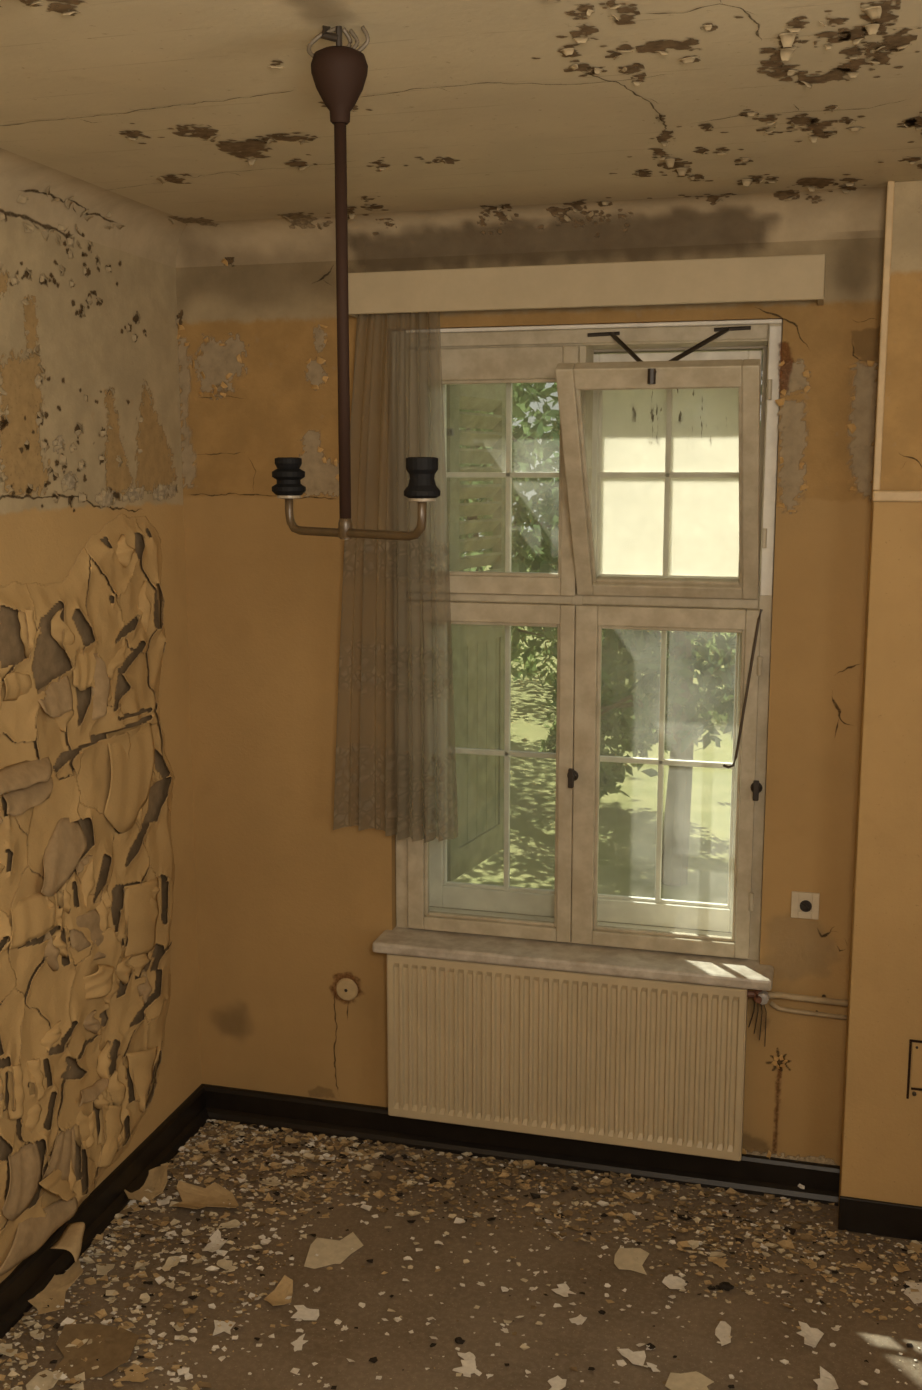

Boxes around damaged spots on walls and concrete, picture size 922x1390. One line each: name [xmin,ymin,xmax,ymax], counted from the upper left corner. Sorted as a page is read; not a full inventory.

peeling [19,0,84,16]
peeling [547,0,718,86]
crack [647,0,760,37]
peeling [757,0,920,89]
peeling [119,123,318,171]
peeling [739,105,865,143]
peeling [897,112,922,169]
peeling [190,333,247,401]
peeling [846,360,878,500]
peeling [299,431,339,498]
peeling [0,231,178,1390]
peeling [213,1320,236,1335]